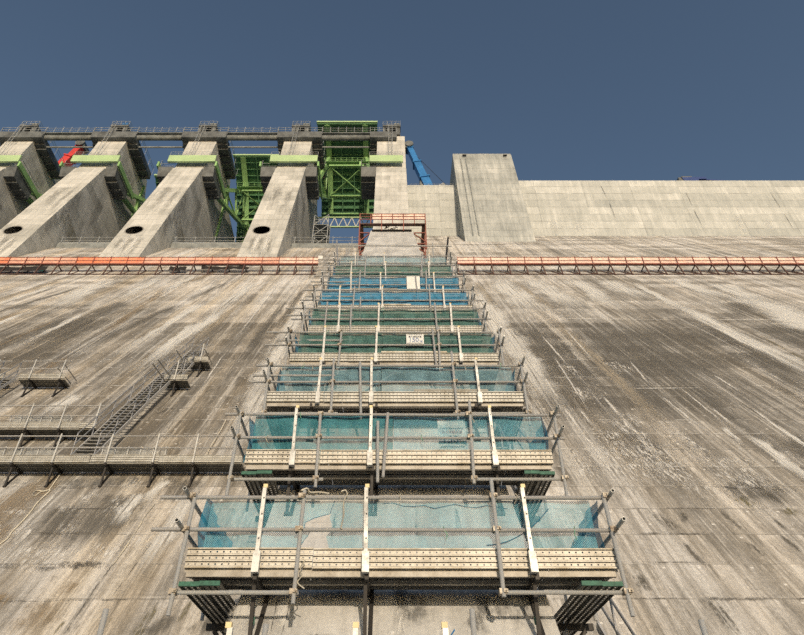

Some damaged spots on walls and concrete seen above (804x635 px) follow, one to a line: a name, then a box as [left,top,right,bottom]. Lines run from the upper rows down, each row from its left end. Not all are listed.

water stain [45,395,81,412]
water stain [0,277,161,373]
water stain [106,285,255,395]
water stain [469,280,804,455]
water stain [752,437,804,476]
water stain [41,480,197,560]